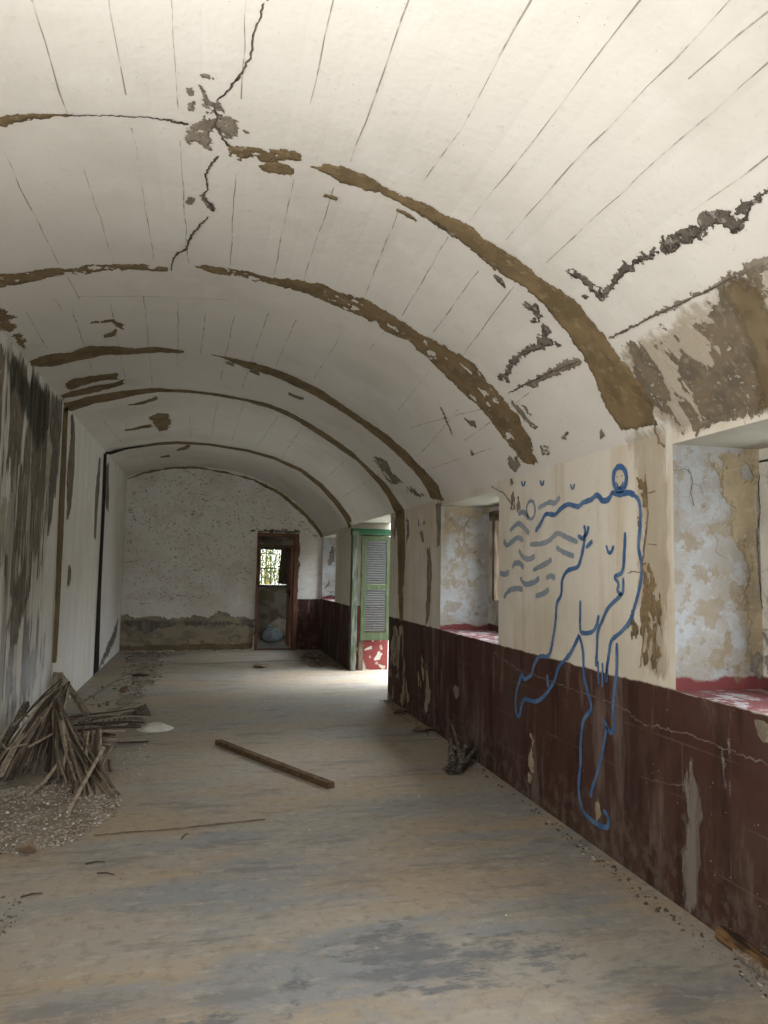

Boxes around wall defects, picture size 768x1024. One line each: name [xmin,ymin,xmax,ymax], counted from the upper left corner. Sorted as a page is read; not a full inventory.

flaking render [0,113,69,128]
crack [67,114,188,125]
crack [171,3,263,270]
flaking render [0,264,168,288]
flaking render [185,74,768,513]
peeling [0,308,489,712]
leakage [99,619,255,669]
peeling [754,719,768,743]